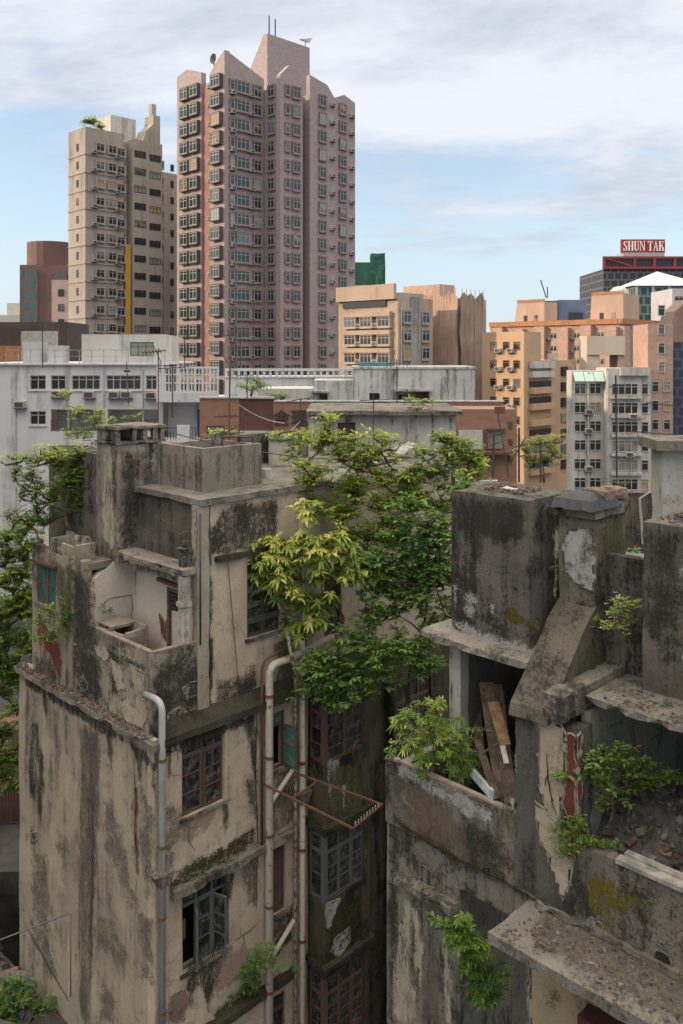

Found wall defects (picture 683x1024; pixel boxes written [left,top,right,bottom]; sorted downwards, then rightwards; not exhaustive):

peeling [36,608,63,679]
damp [91,449,187,550]
damp [454,495,528,559]
damp [453,585,535,652]
peeling [560,527,598,592]
damp [643,527,683,651]
damp [24,499,279,1021]
damp [397,765,514,880]
peeling [534,720,583,901]
peeling [324,898,351,957]